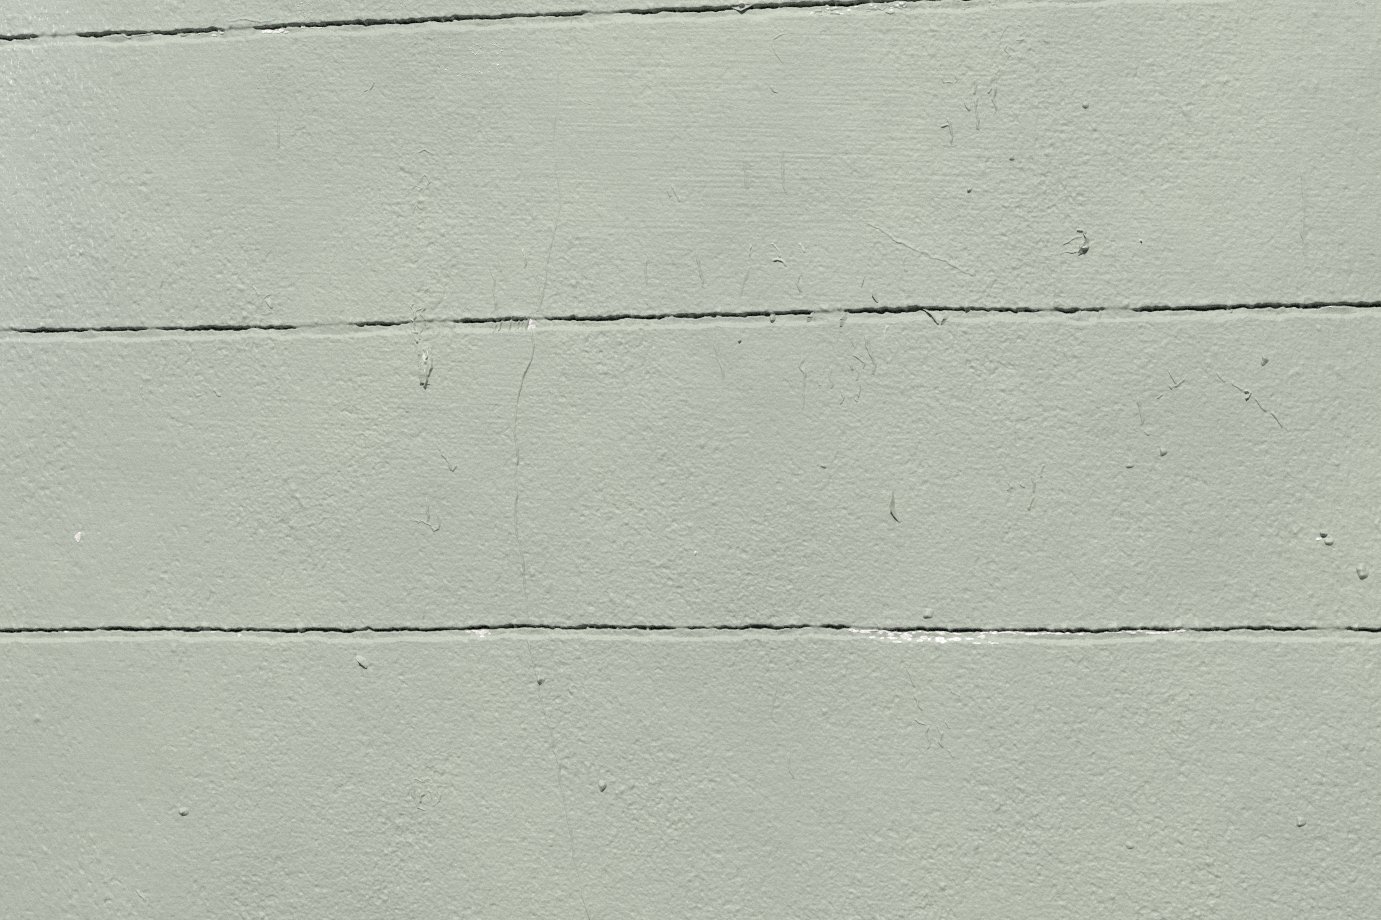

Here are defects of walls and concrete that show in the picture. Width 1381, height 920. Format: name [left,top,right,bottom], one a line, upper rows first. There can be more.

spalling [1059,228,1090,255]
peeling [409,303,433,389]
crack [513,66,593,920]